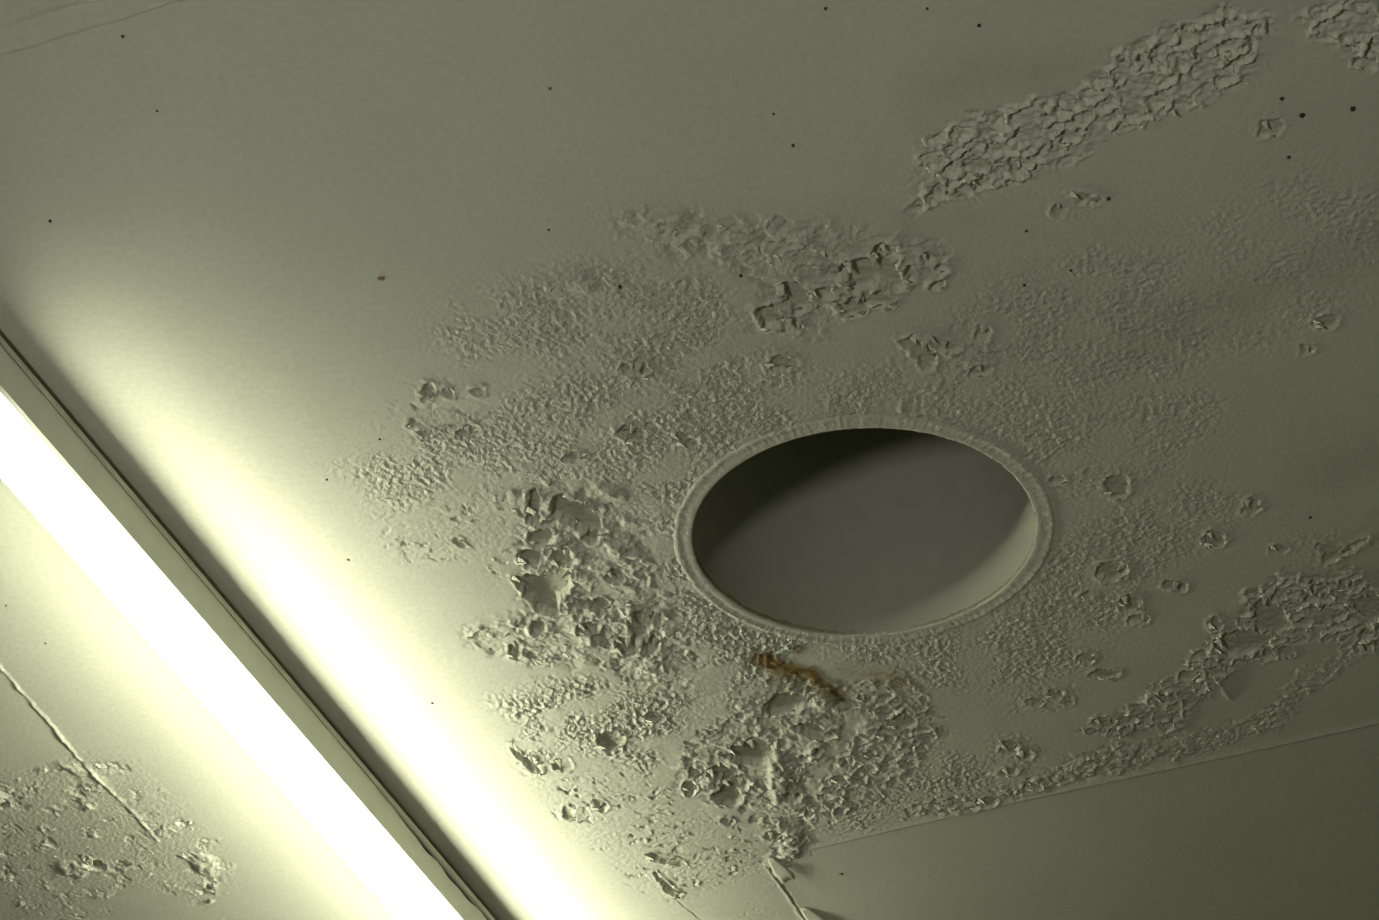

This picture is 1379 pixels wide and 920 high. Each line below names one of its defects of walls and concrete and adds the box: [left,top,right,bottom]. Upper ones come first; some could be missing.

peeling [588,0,1379,351]
spalling [375,366,491,427]
corrosion [697,559,835,633]
corrosion [755,645,843,701]
spalling [361,469,1379,920]
peeling [0,747,248,920]
crack [686,908,707,920]
crack [768,858,826,920]